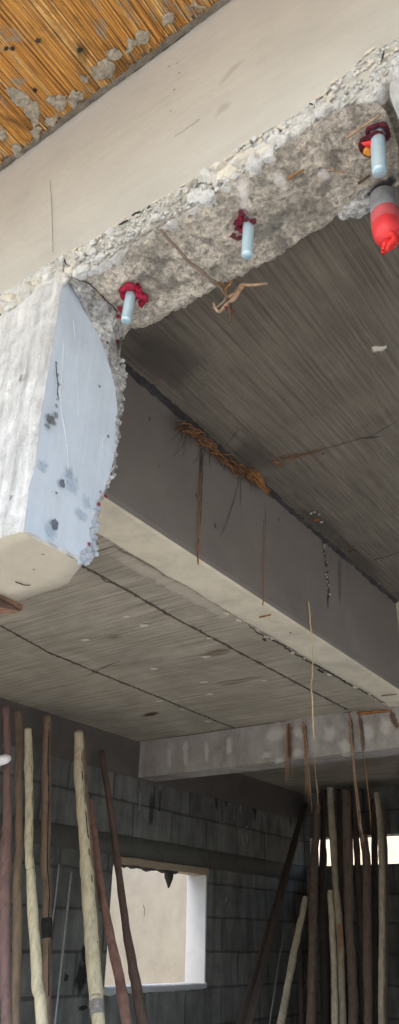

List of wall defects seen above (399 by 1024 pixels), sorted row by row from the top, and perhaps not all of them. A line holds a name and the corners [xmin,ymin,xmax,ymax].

spalling [0,40,399,566]
crack [0,625,286,741]
crack [81,565,386,714]
corrosion [349,711,399,750]